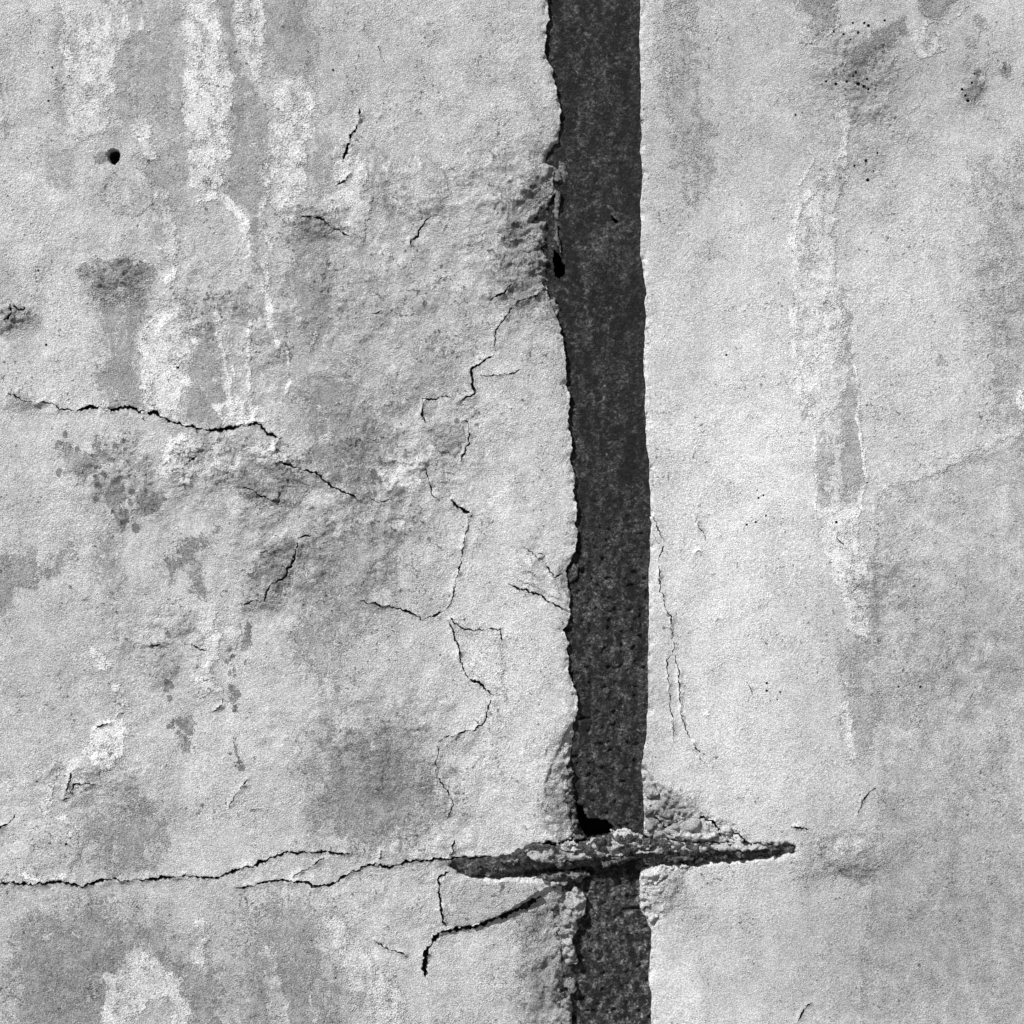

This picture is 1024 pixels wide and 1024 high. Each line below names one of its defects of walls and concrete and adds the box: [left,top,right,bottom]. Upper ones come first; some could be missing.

crack [334,107,382,186]
crack [6,391,391,506]
crack [419,284,541,462]
crack [0,462,541,978]
crack [508,546,571,613]
crack [650,515,702,761]
crack [694,515,706,555]
spalling [601,762,779,933]